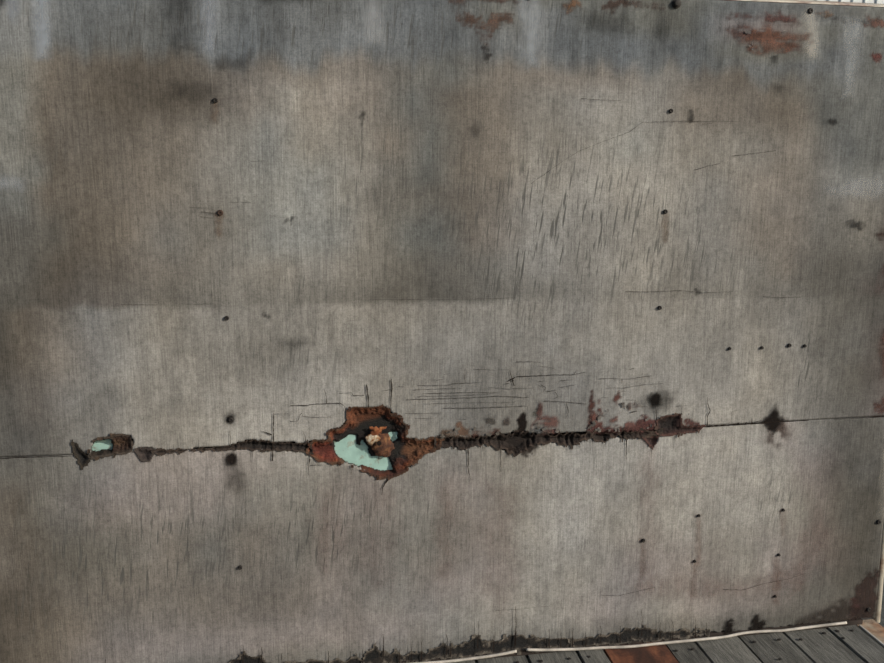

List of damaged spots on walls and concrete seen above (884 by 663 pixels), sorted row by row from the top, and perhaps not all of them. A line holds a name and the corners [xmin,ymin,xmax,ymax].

crack [706,410,809,427]
peeling [365,426,387,445]